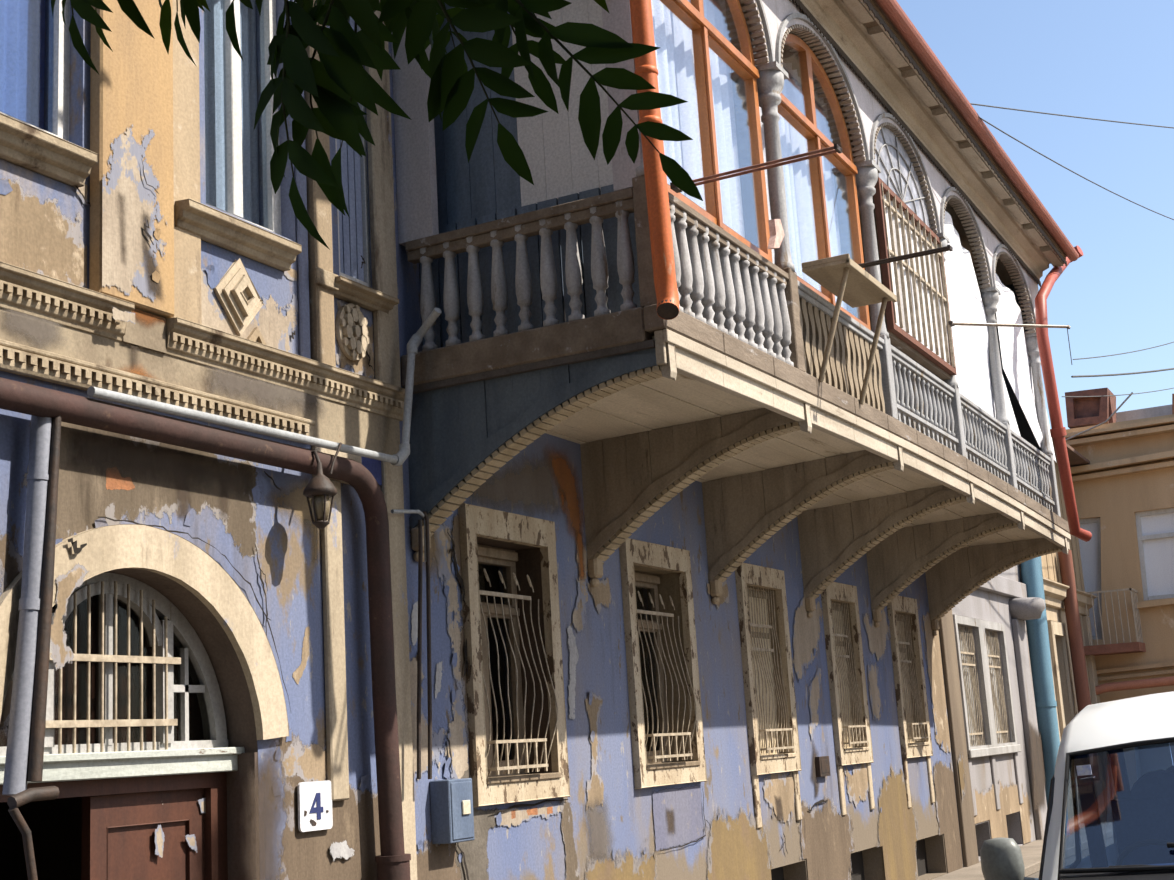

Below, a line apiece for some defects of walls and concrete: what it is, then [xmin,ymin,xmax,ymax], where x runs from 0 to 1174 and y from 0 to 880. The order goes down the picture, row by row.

flaking render [0,178,87,288]
flaking render [102,124,167,302]
spalling [112,307,135,324]
leakage [72,433,250,517]
rust [549,453,585,578]
flaking render [292,626,310,684]
flaking render [409,514,470,781]
flaking render [567,538,612,811]
flaking render [792,596,823,740]
flaking render [585,847,657,880]
flaking render [707,763,918,880]